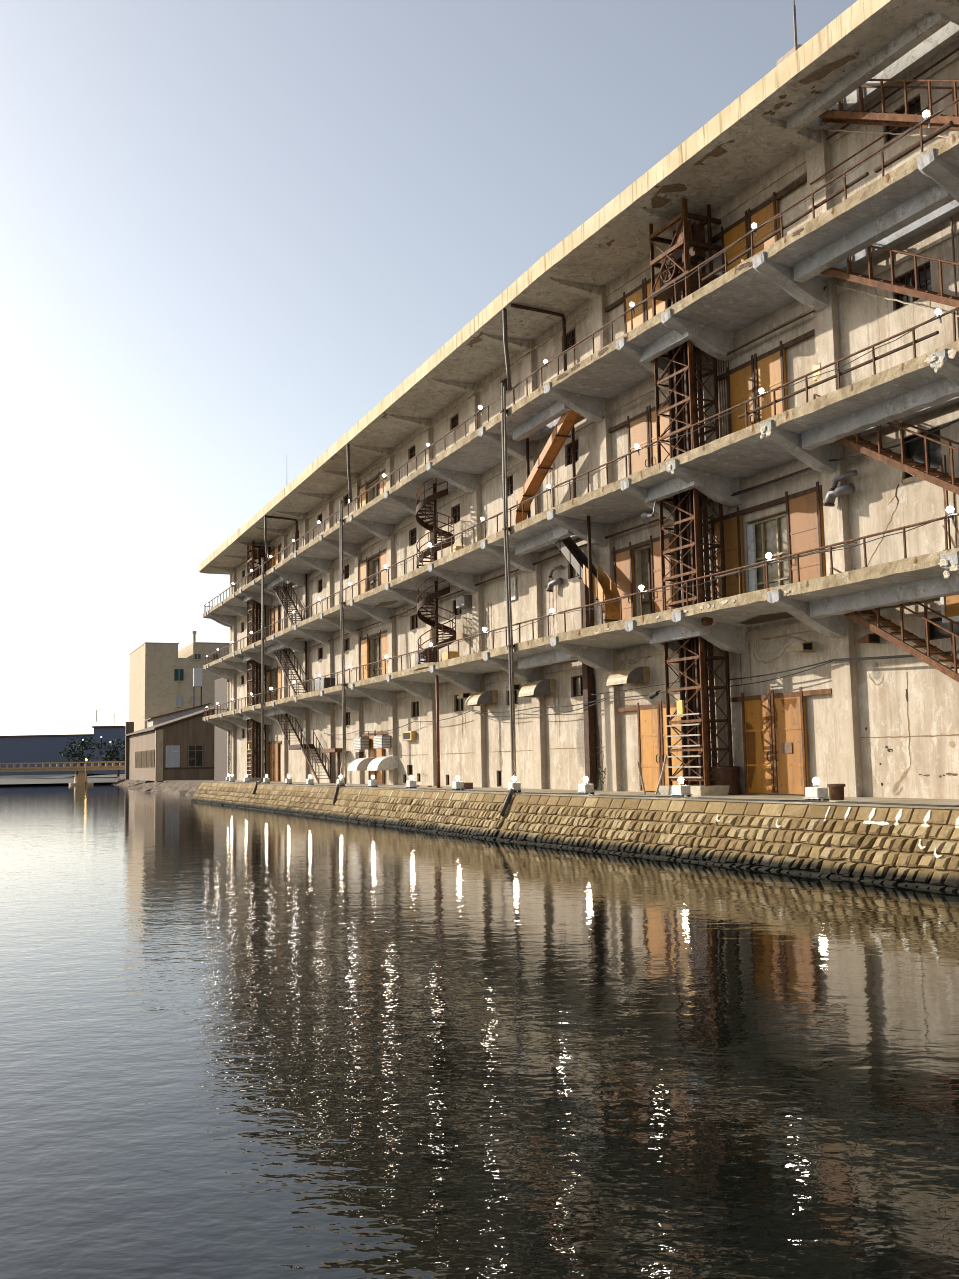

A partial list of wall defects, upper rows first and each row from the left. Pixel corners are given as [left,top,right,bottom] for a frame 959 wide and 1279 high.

spalling [799,52,860,94]
spalling [762,94,792,116]
rust [943,488,959,548]